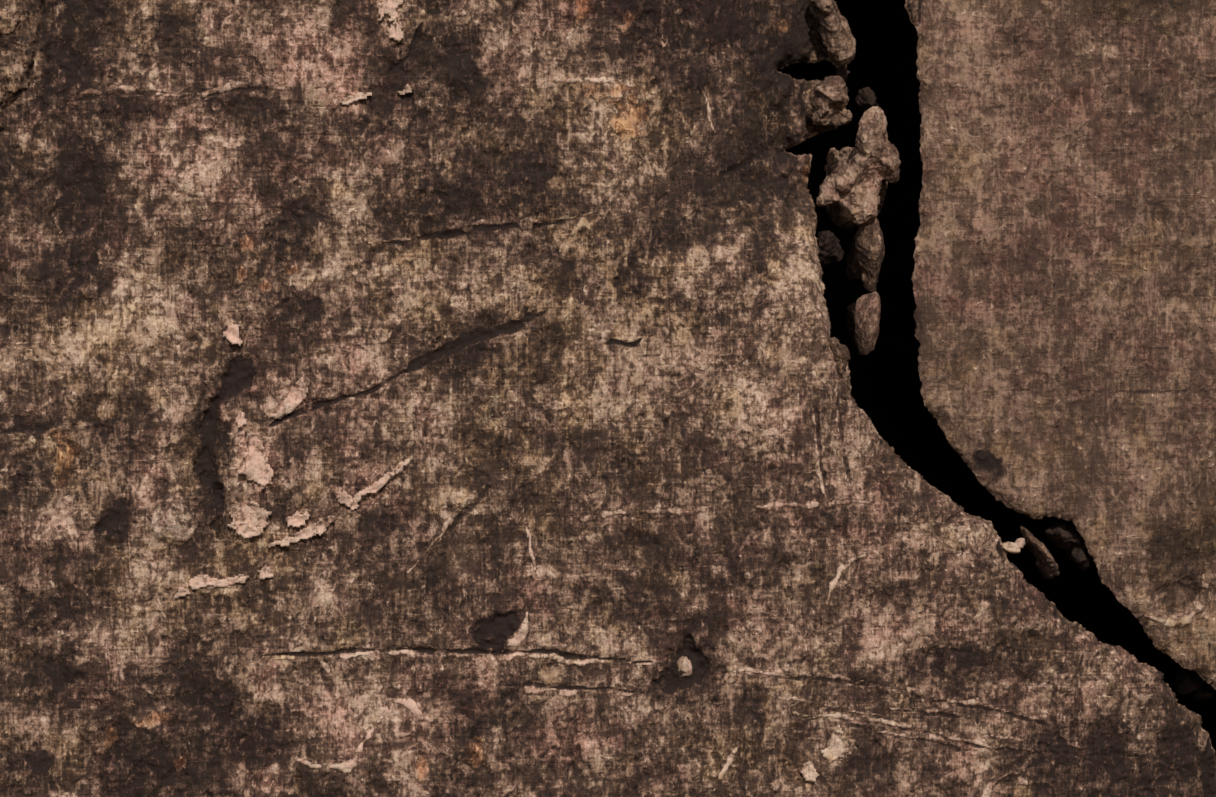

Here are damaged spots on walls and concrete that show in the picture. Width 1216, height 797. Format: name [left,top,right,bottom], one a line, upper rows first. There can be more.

crack [718,0,1216,797]